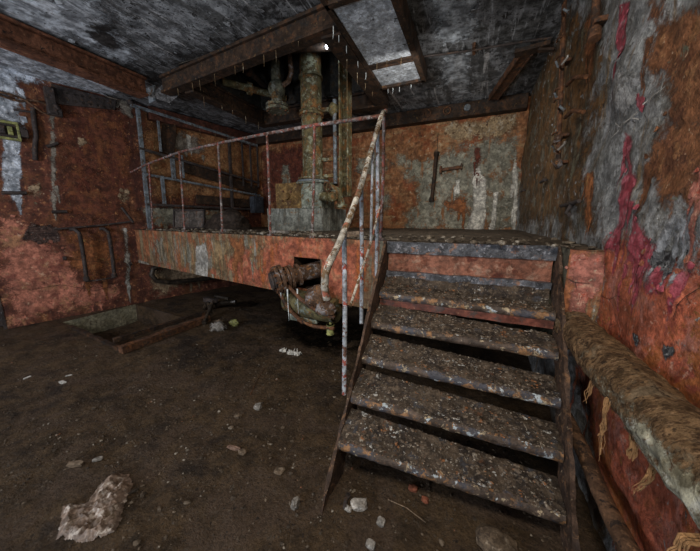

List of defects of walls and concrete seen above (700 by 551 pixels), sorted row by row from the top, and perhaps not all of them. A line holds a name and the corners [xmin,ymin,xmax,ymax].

peeling [613,1,630,79]
damp [1,139,22,214]
rust [53,105,135,299]
peeling [397,114,521,230]
damp [465,166,498,230]
damp [510,155,518,230]
peeling [565,134,700,409]
peeling [570,362,700,551]